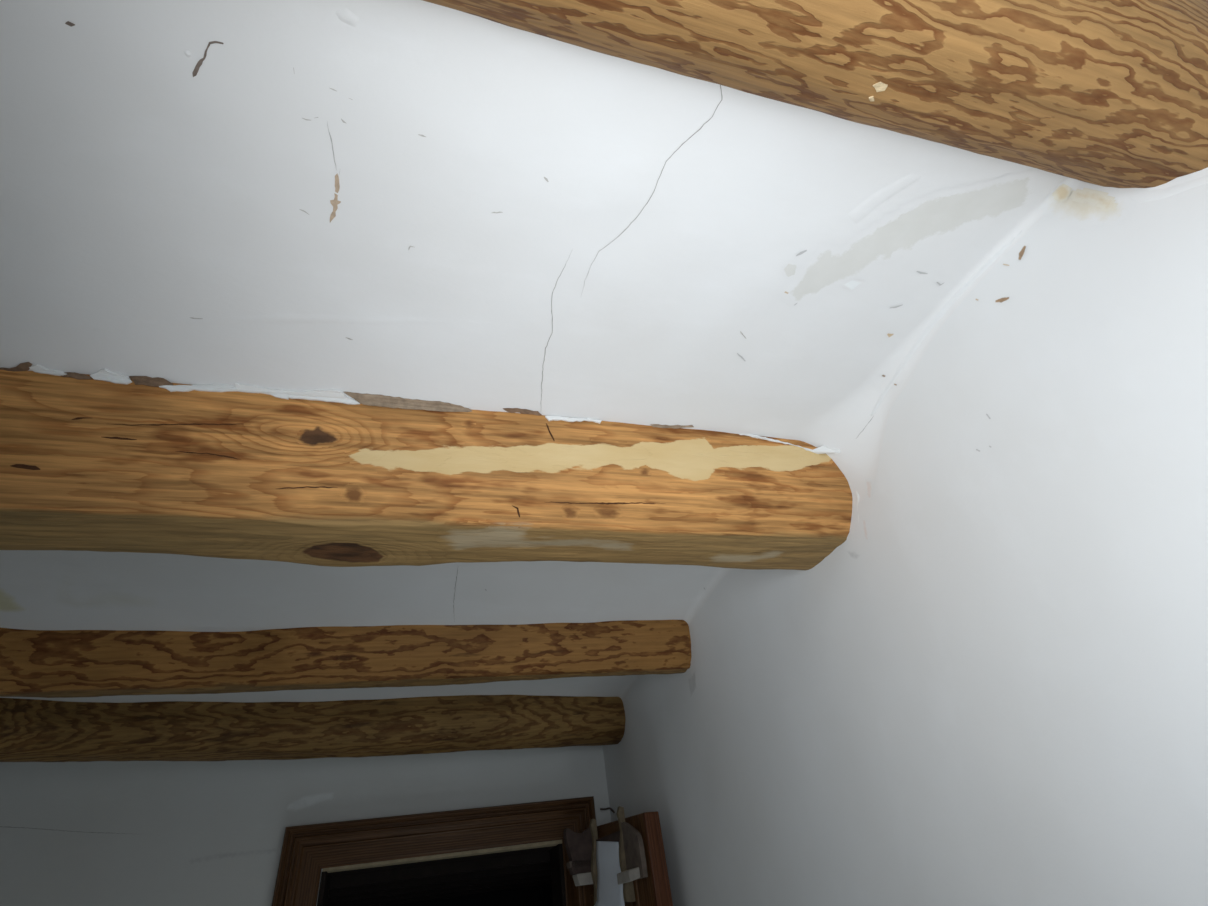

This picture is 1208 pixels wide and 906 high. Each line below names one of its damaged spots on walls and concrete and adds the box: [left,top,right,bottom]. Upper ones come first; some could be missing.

peeling [192,41,223,77]
peeling [327,123,341,222]
crack [541,85,722,399]
peeling [780,168,1041,307]
peeling [0,362,472,412]
peeling [503,408,602,424]
peeling [739,433,840,454]